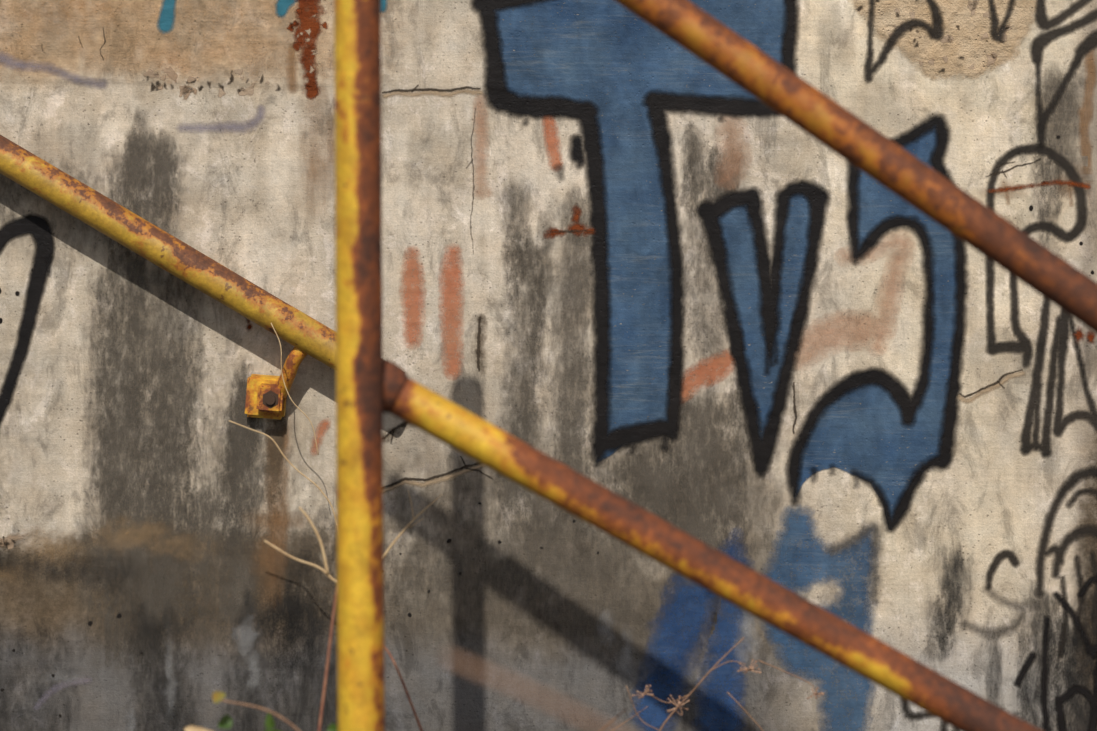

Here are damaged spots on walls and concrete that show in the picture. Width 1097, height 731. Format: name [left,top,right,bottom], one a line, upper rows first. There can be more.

peeling [144,0,297,99]
rust [287,0,327,99]
crack [382,85,482,109]
peeling [854,0,1037,78]
damp [112,115,178,233]
crack [958,370,1024,402]
damp [0,251,337,731]